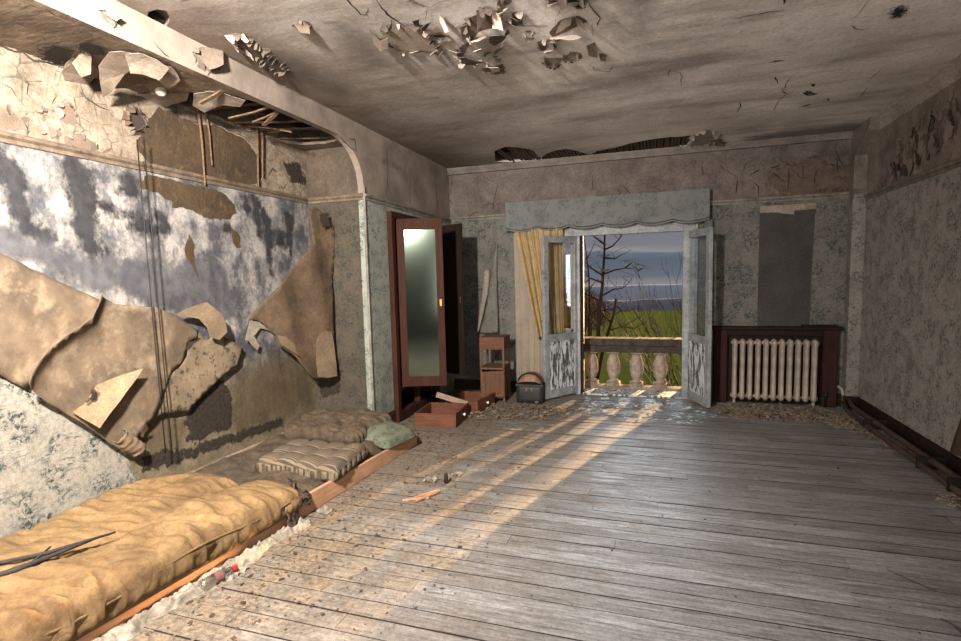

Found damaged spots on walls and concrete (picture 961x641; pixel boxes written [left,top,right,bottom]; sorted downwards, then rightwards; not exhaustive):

damp [37,42,106,66]
peeling [95,3,122,28]
peeling [193,33,290,76]
peeling [292,20,312,34]
crack [347,0,449,55]
peeling [370,0,612,76]
spalling [62,48,265,248]
damp [283,162,306,186]
peeling [877,94,961,189]
damp [0,148,235,319]
spalling [184,235,199,277]
damp [239,194,294,276]